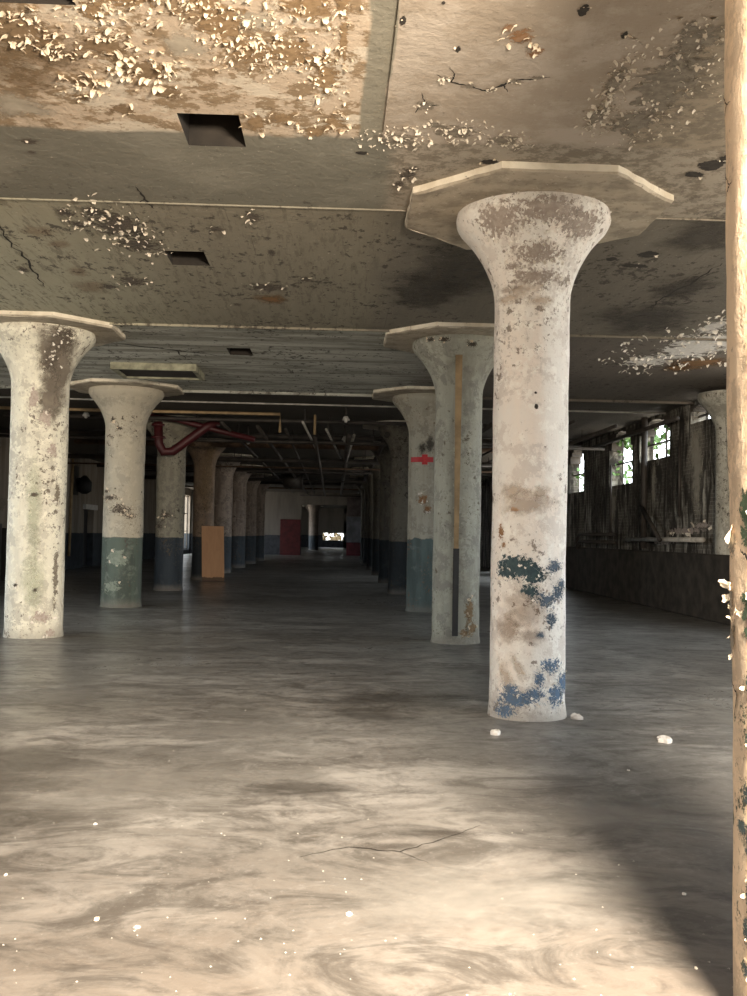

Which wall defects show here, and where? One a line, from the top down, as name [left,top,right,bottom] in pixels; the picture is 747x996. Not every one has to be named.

peeling [497,23,545,59]
peeling [0,0,534,155]
crack [438,72,549,92]
peeling [574,14,725,151]
peeling [392,166,421,191]
crack [0,226,45,287]
peeling [55,193,176,264]
peeling [598,310,727,376]
peeling [725,489,747,556]
peeling [496,524,566,638]
peeling [718,576,747,660]
peeling [493,657,567,718]